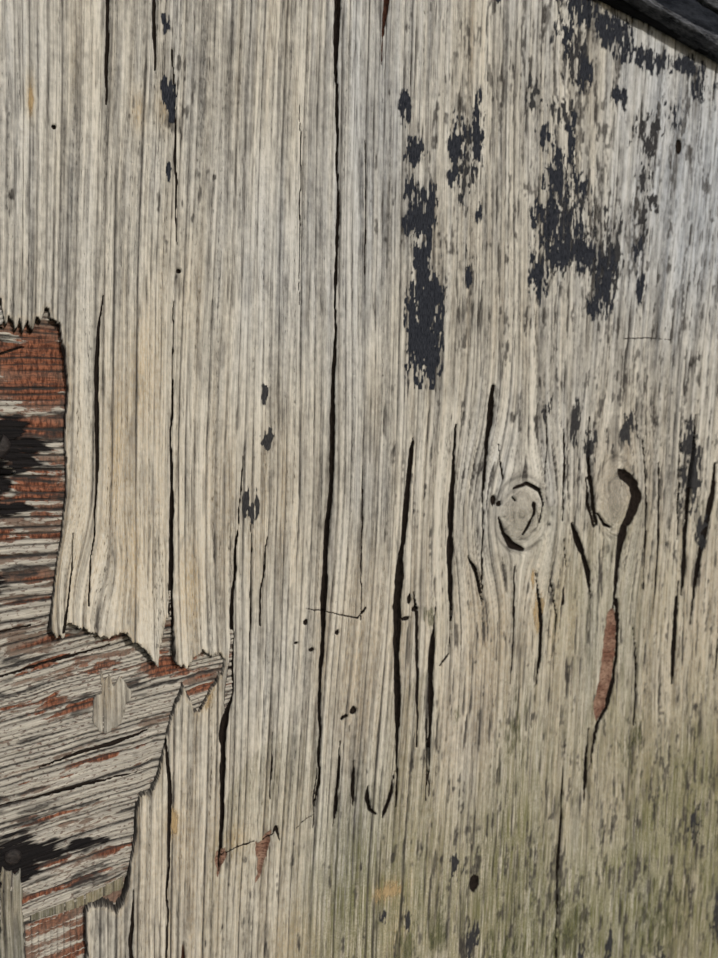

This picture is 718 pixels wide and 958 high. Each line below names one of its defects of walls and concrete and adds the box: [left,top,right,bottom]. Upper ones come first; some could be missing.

crack [152,0,178,244]
peeling [398,85,486,390]
peeling [528,108,618,321]
peeling [610,84,628,111]
peeling [550,0,718,103]
peeling [632,235,647,305]
peeling [652,94,683,154]
crack [218,0,716,958]
peeling [0,300,234,958]
crack [710,638,718,677]